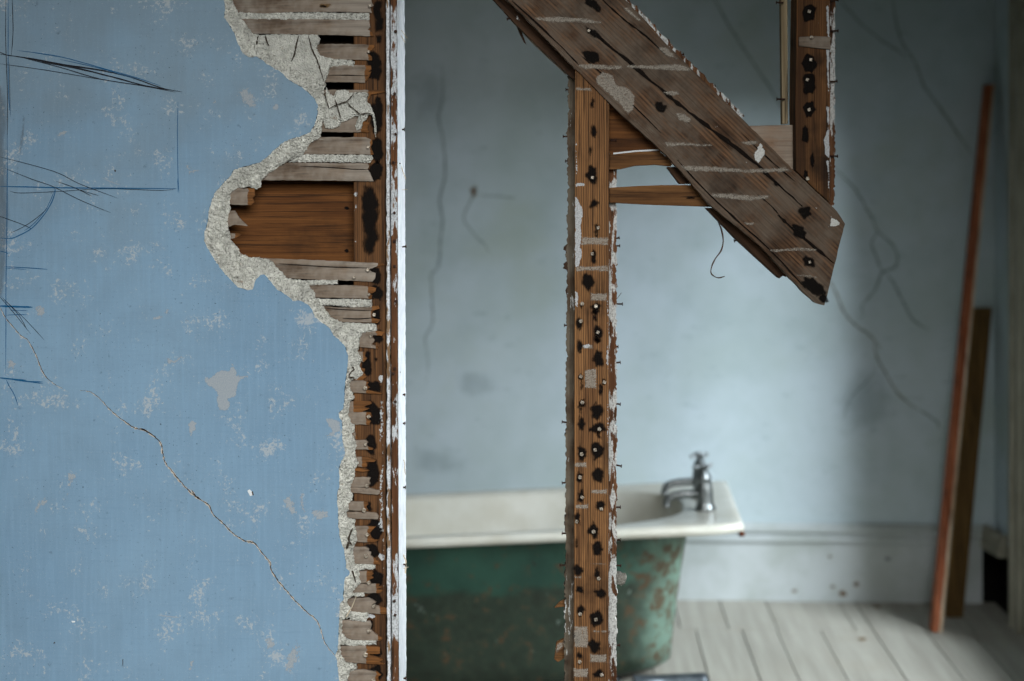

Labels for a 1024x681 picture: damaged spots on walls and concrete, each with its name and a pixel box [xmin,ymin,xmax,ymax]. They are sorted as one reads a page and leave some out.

crack [0,308,334,655]
flaking render [204,0,377,681]
crack [512,0,940,428]